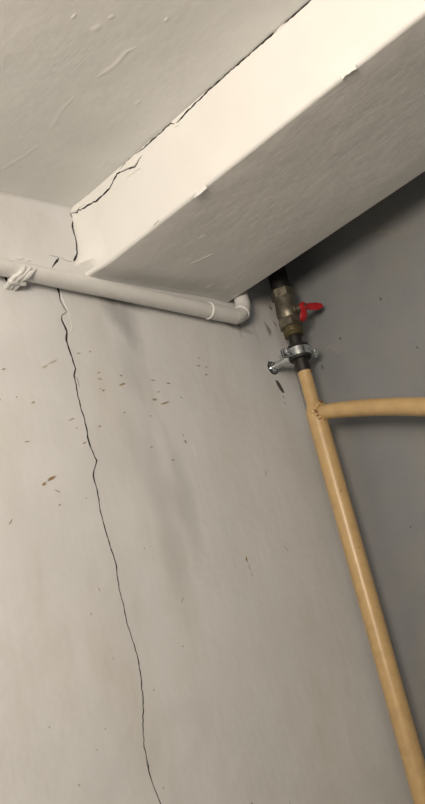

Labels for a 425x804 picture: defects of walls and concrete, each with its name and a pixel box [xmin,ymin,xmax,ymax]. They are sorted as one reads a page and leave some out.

crack [51,0,311,268]
crack [57,288,161,804]